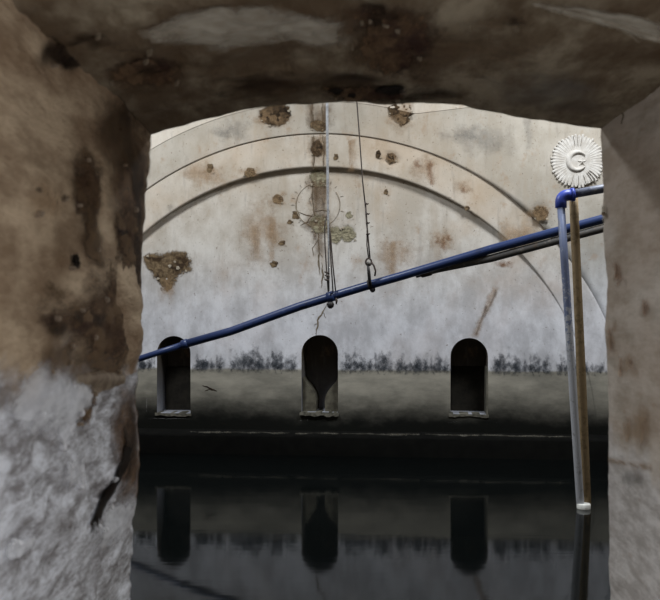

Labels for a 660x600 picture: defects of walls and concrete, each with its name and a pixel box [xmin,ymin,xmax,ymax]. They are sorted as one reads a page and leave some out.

spalling [259,105,291,127]
spalling [311,140,323,157]
spalling [321,85,411,127]
leakage [105,103,149,288]
spalling [115,206,192,291]
spalling [532,206,549,221]
crack [90,431,134,533]
leakage [112,389,140,495]